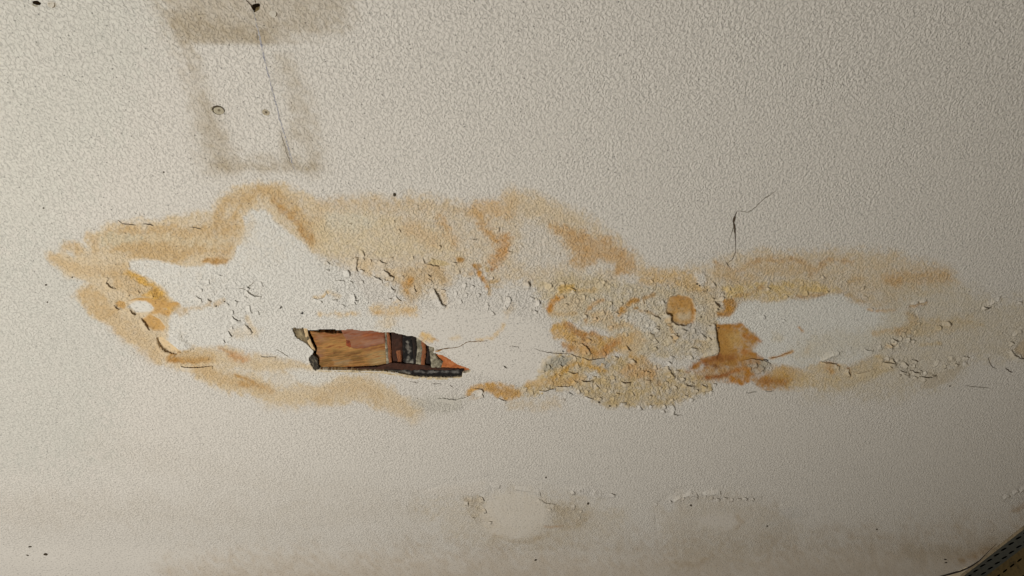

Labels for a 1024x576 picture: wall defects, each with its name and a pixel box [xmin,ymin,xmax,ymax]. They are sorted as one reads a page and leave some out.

peeling [114,207,911,416]
damp [43,175,1024,424]
crack [726,191,776,267]